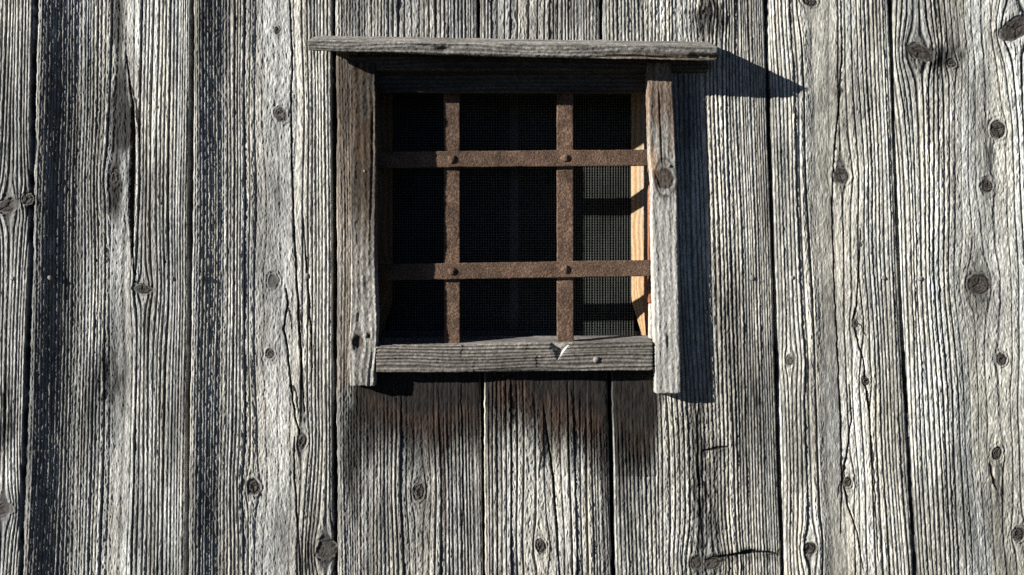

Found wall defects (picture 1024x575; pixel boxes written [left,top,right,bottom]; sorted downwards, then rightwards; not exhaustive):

crack [283,1,313,575]
crack [707,548,778,563]